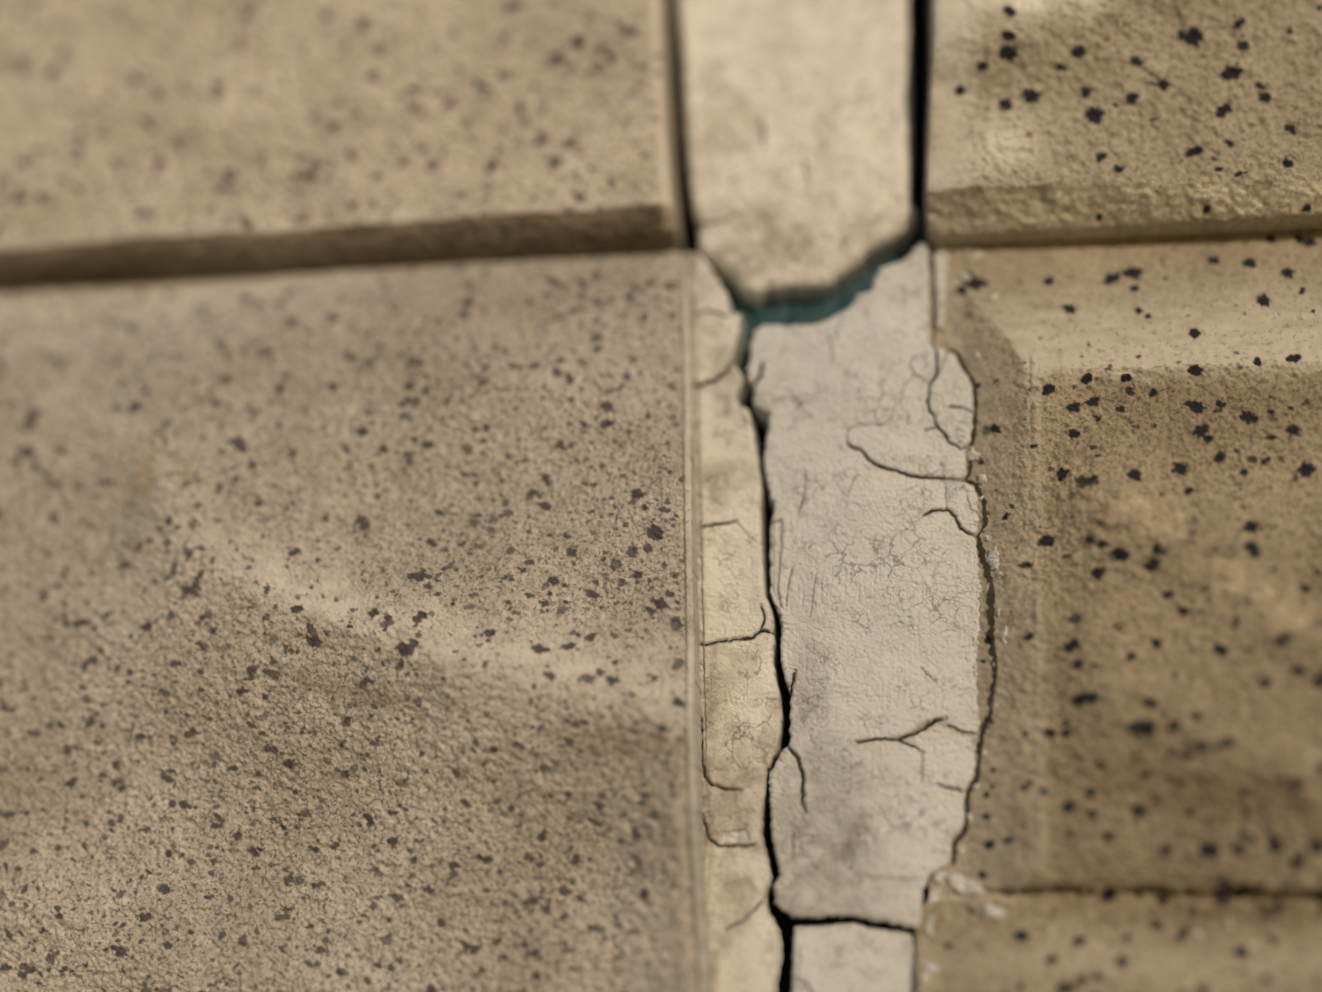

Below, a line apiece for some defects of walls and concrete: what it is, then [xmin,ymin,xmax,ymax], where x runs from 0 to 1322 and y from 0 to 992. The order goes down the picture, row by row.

crack [694,246,998,992]